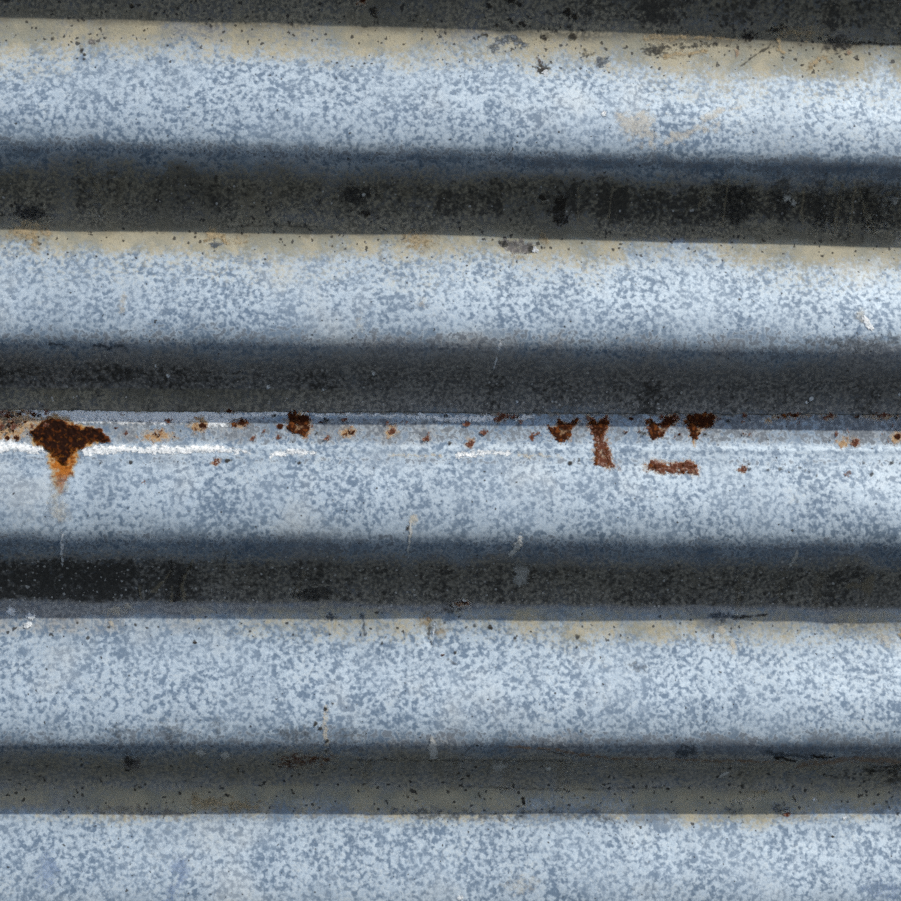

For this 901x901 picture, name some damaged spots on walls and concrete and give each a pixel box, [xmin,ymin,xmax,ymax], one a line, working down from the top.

corrosion [0,408,541,486]
corrosion [529,414,615,469]
corrosion [643,459,699,475]
corrosion [624,411,752,447]